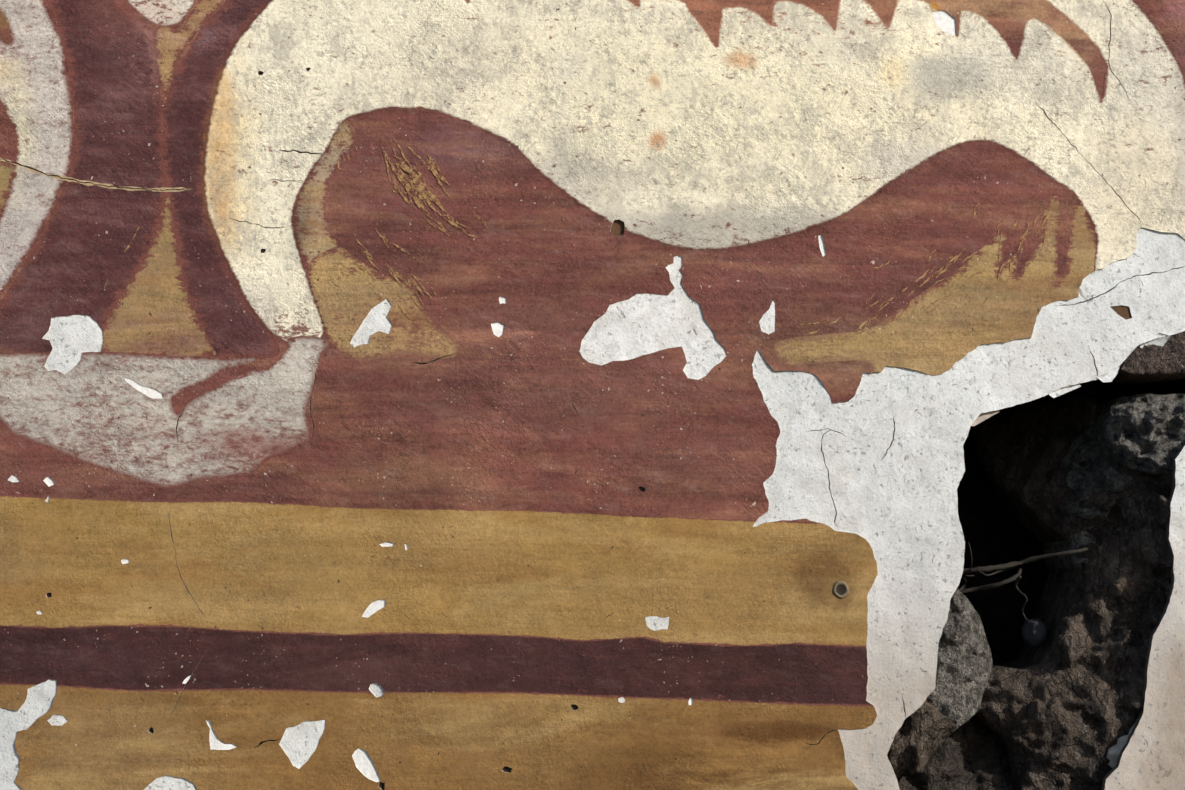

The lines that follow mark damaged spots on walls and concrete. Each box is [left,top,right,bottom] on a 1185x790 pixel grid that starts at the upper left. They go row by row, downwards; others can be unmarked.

peeling [42,314,103,374]
peeling [350,299,392,347]
peeling [580,256,727,380]
crack [808,429,839,523]
spalling [752,228,1185,790]
peeling [0,679,68,790]
peeling [279,719,326,769]